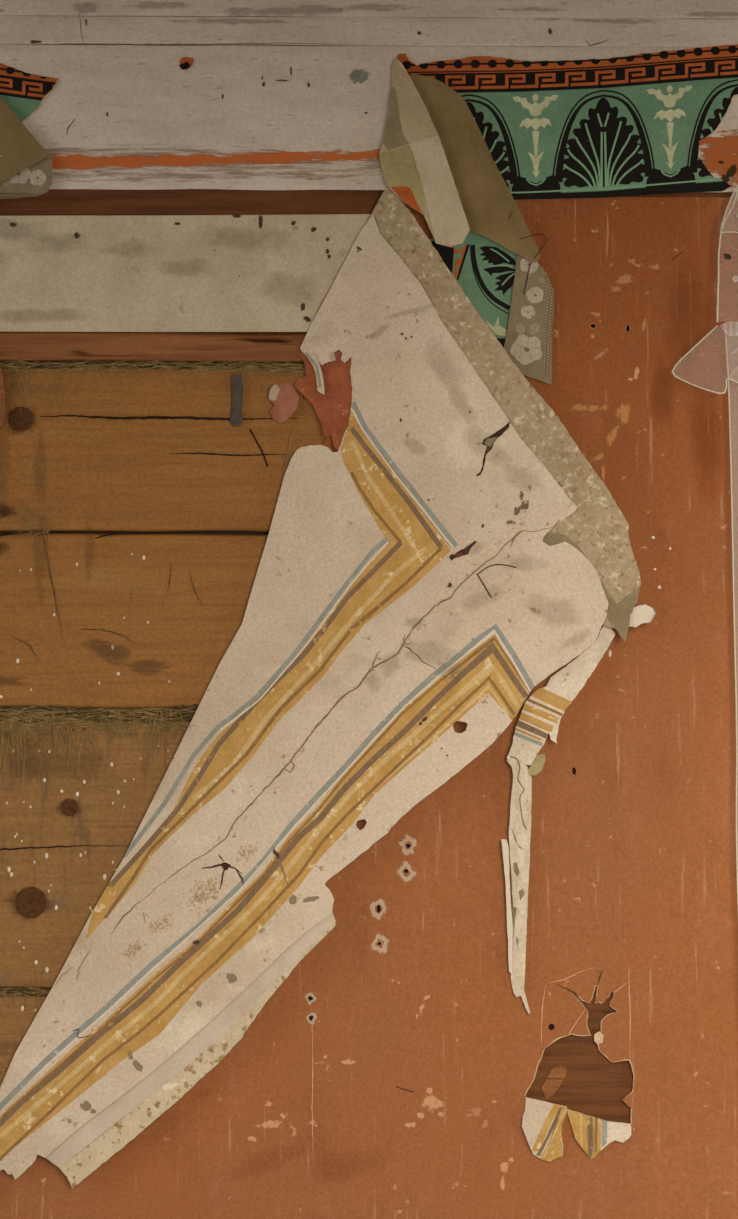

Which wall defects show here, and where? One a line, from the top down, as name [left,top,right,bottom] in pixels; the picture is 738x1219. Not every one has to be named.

peeling [699,130,738,187]
peeling [51,57,554,385]
crack [40,413,297,421]
crack [175,450,287,458]
crack [0,528,140,646]
peeling [0,190,656,1188]
crack [55,527,552,985]